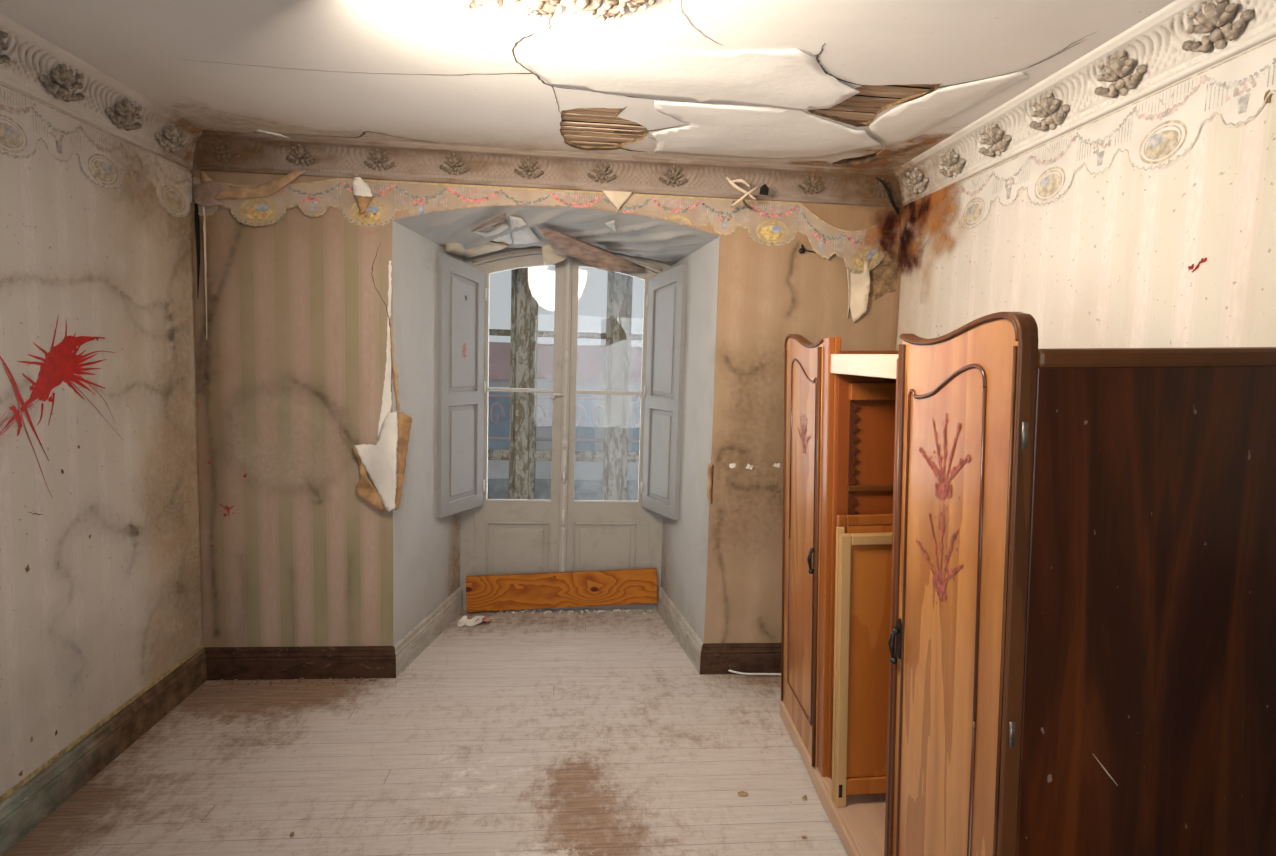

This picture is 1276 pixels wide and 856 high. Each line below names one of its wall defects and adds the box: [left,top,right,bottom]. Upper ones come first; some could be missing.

crack [295,131,438,144]
crack [463,19,715,139]
peeling [519,29,1028,160]
crack [804,43,864,86]
crack [864,128,899,214]